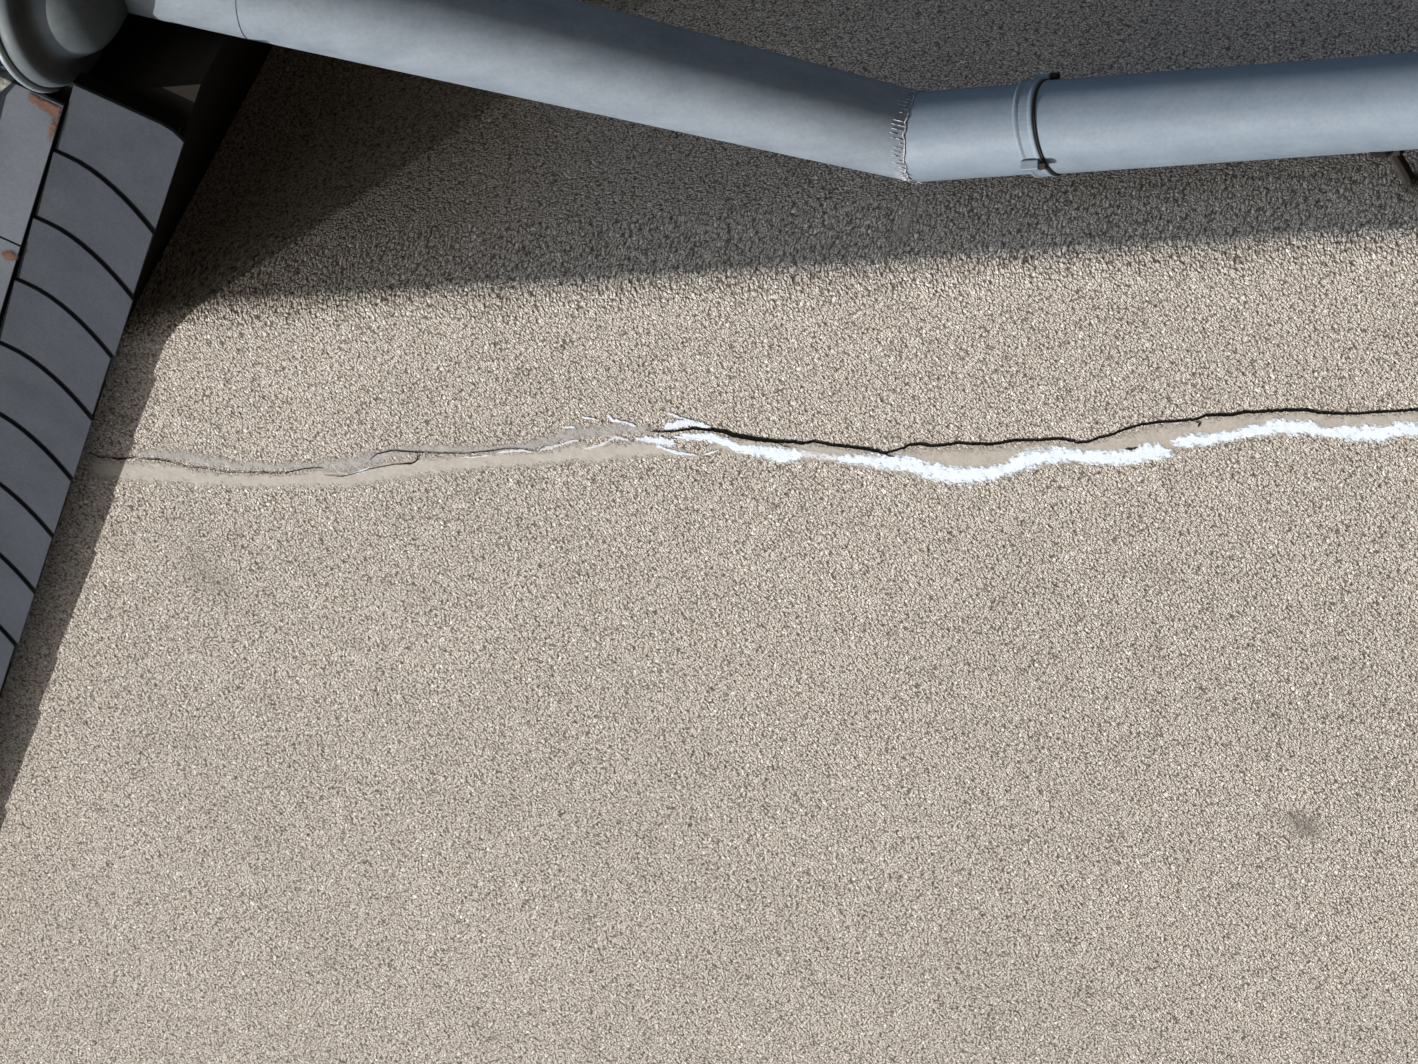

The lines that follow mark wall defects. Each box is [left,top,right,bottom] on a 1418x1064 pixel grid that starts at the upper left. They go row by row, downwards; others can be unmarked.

corrosion [28,93,60,138]
crack [85,446,544,477]
crack [645,409,1418,457]
water stain [680,418,1418,485]